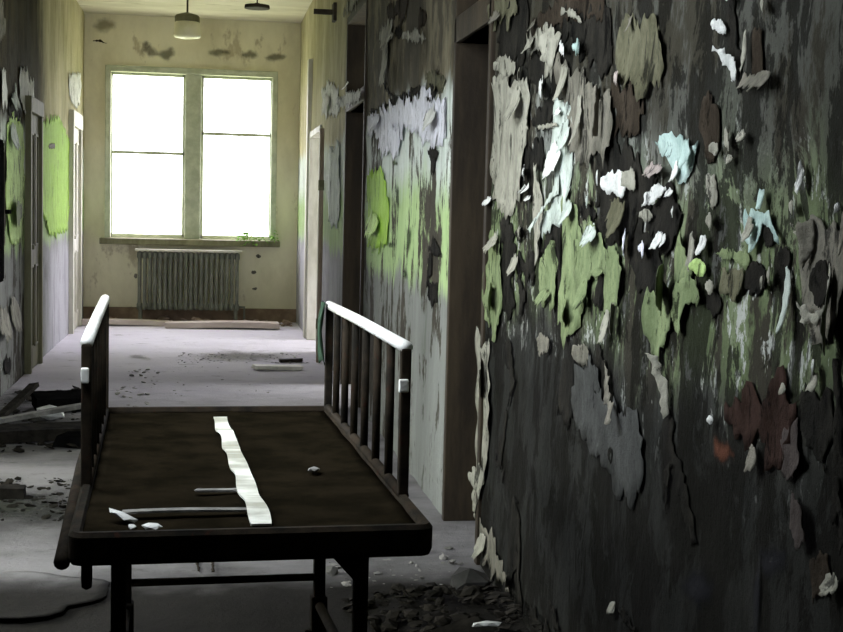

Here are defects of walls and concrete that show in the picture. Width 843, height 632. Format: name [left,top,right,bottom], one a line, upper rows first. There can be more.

damp [145,42,173,58]
peeling [321,78,361,119]
peeling [2,64,34,246]
peeling [43,115,70,238]
peeling [364,69,446,255]
peeling [0,295,22,375]
flaking render [426,237,442,309]
peeling [468,0,843,592]
flaking render [809,550,839,605]